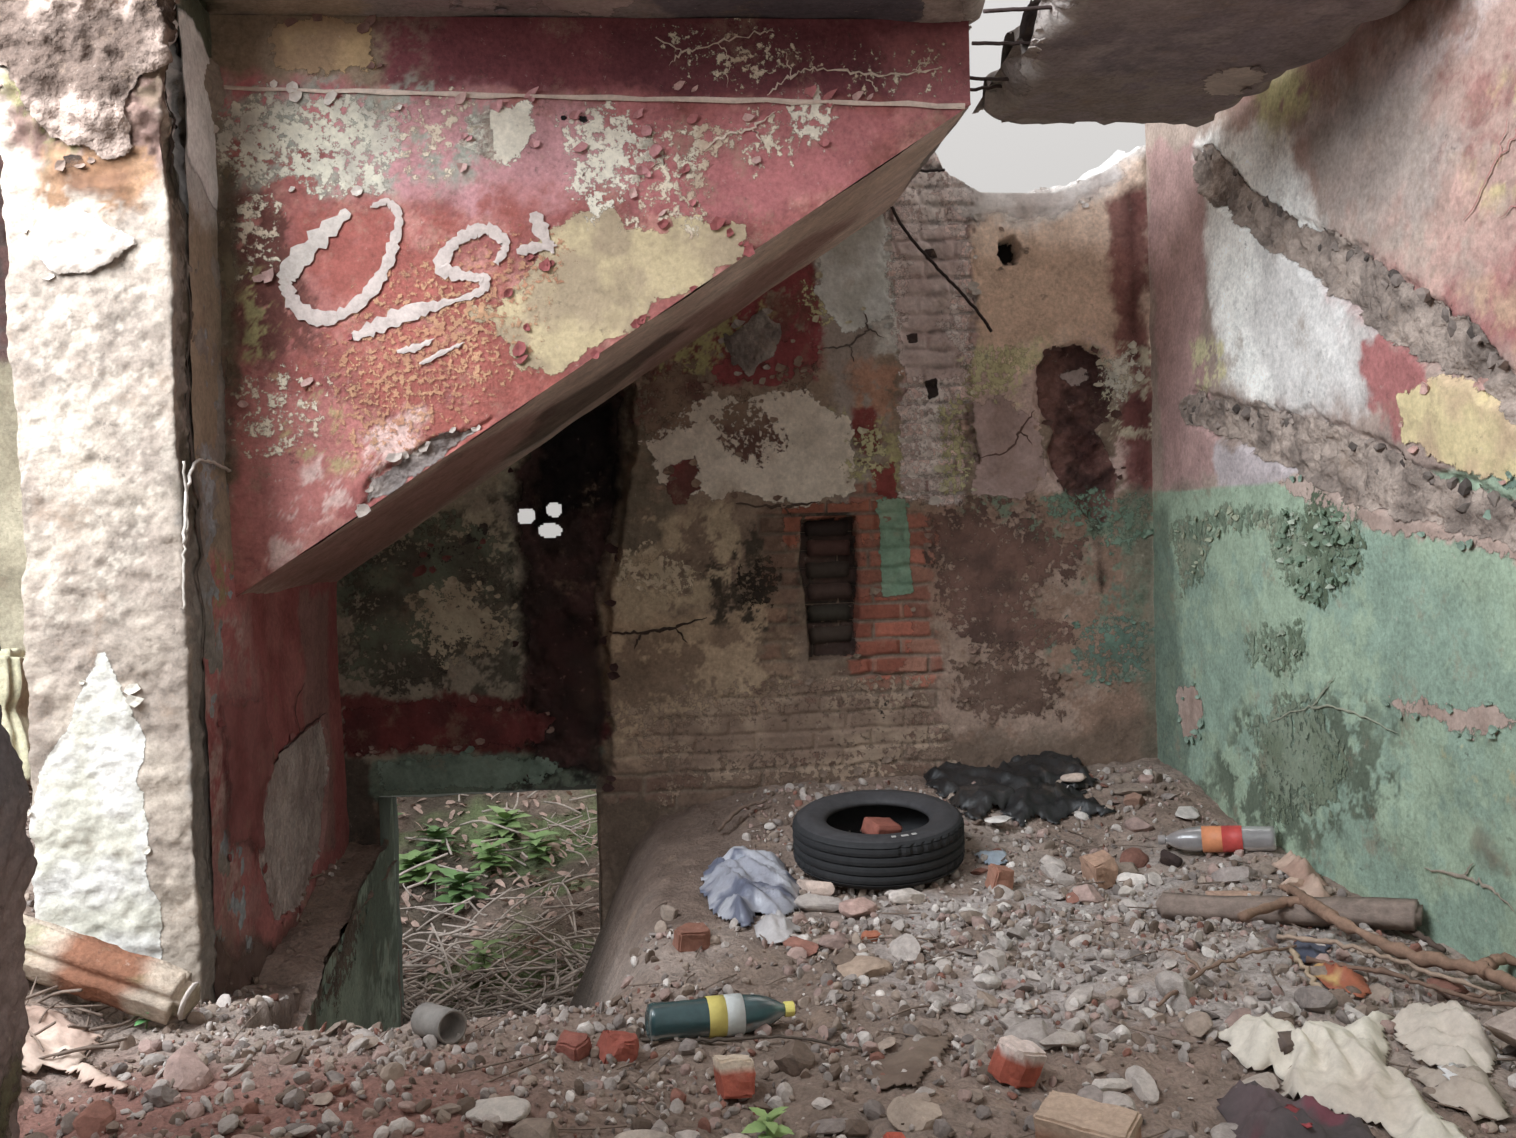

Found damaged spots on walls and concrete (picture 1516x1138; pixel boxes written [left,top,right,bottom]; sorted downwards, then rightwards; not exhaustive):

peeling [1202,65,1268,96]
rust [65,162,127,198]
peeling [213,0,1078,518]
crack [822,314,884,362]
crack [981,410,1035,458]
spalling [632,143,1516,777]
crack [609,617,707,649]
spalling [27,652,163,959]
spalling [259,720,329,924]
damp [1245,683,1350,834]